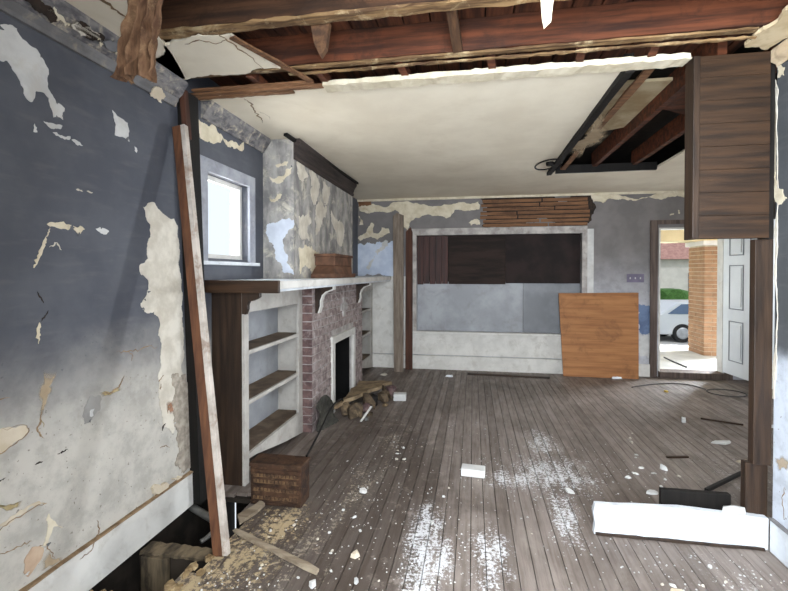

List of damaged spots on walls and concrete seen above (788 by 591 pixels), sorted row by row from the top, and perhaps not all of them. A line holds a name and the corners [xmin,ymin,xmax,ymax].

crack [100,0,125,17]
peeling [0,24,83,146]
peeling [33,222,84,268]
peeling [266,161,345,275]
flaking render [358,193,684,276]
peeling [772,65,787,399]
peeling [139,202,191,496]
peeling [0,424,30,454]